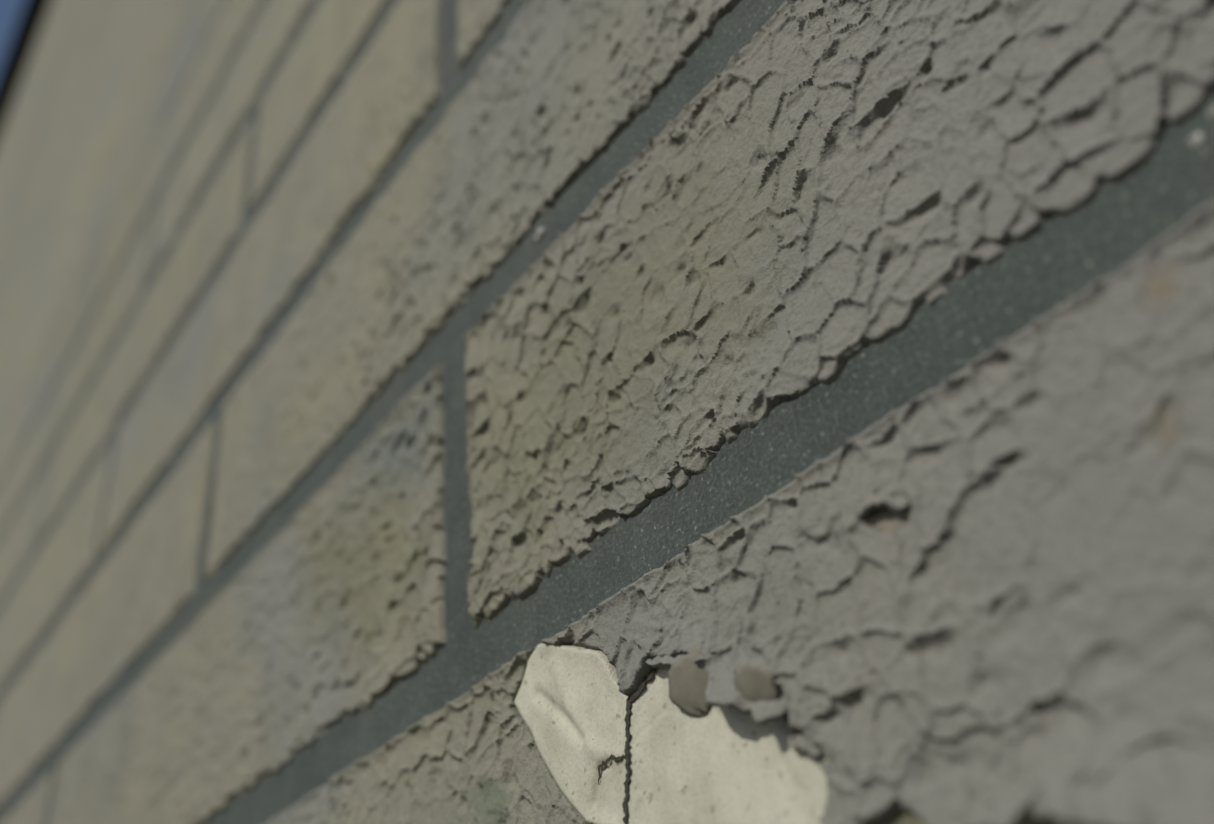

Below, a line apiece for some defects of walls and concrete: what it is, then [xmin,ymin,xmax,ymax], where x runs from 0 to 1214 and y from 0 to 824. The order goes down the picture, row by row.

crack [598,667,660,824]
peeling [515,643,827,824]
peeling [1019,759,1214,824]